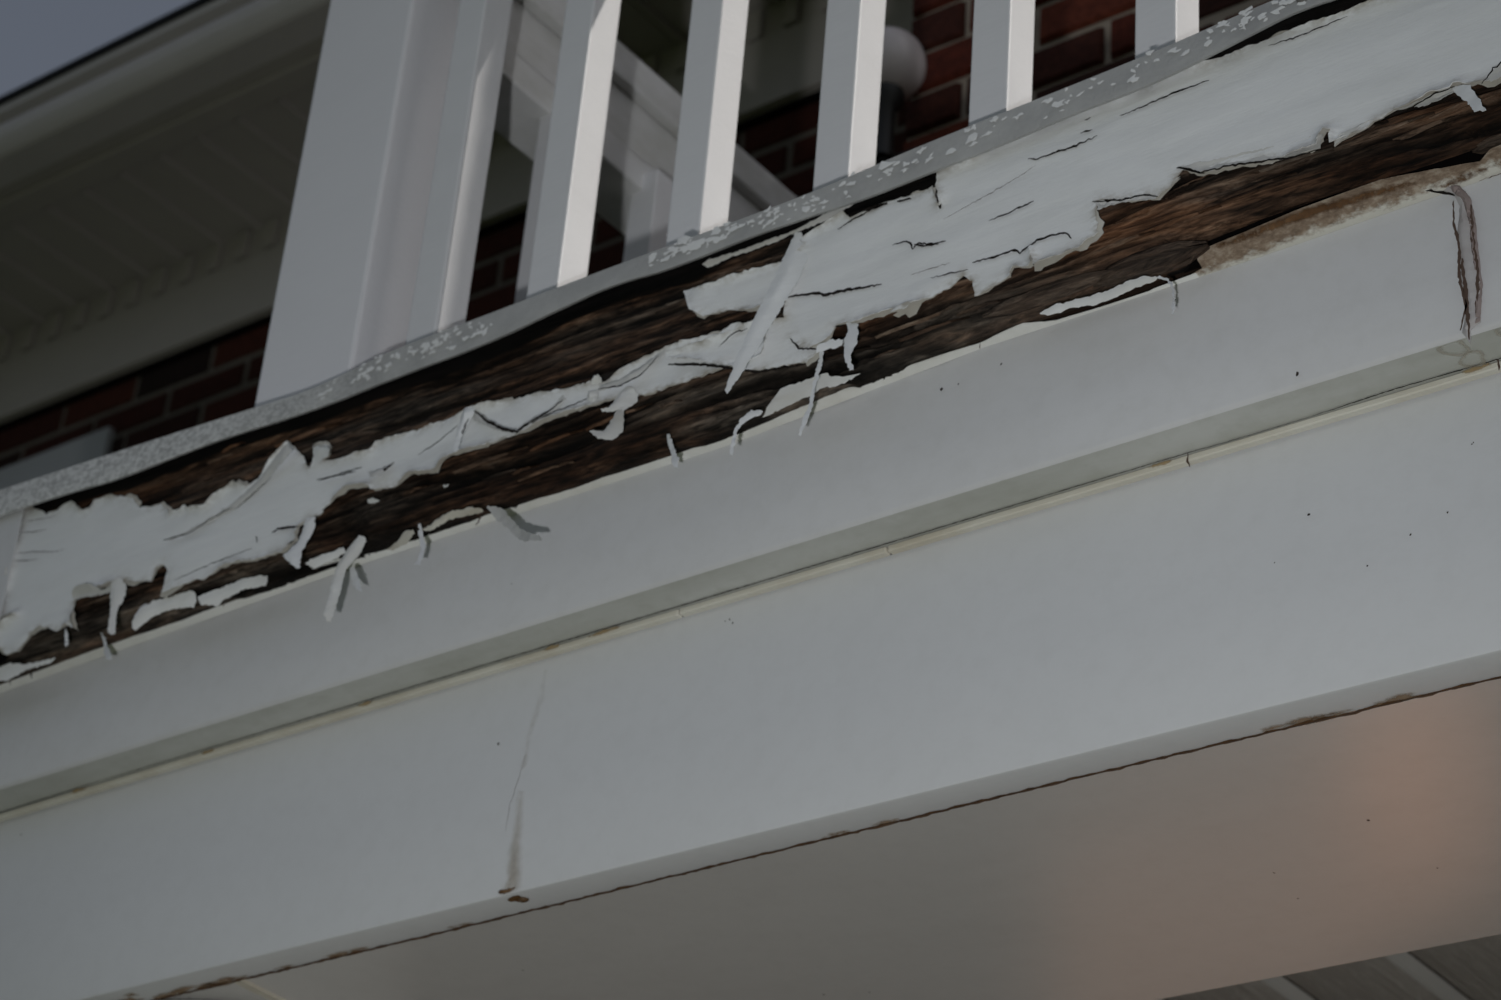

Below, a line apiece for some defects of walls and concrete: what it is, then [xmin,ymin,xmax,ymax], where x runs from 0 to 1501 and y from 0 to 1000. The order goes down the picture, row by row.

crack [1268,16,1347,46]
crack [1384,62,1501,118]
crack [1092,149,1319,202]
crack [317,80,1209,482]
peeling [0,0,1501,693]
crack [0,173,1501,813]
leakage [498,887,529,903]